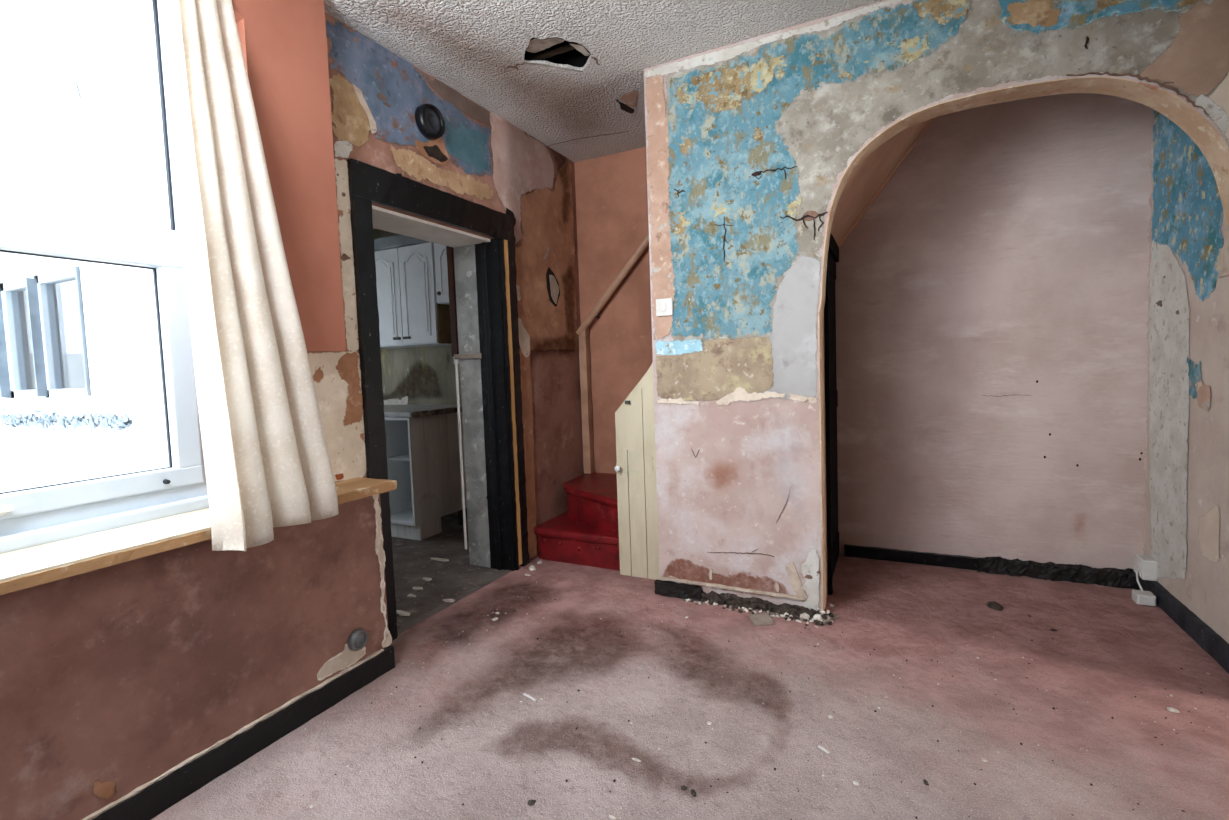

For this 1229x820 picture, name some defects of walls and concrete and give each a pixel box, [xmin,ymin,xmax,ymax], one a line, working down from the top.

peeling [998,0,1198,35]
spalling [524,37,591,67]
peeling [325,18,494,200]
crack [751,166,797,179]
peeling [644,0,971,356]
crack [780,211,828,240]
peeling [308,140,367,482]
peeling [1148,109,1224,580]
spalling [657,387,817,407]
spalling [348,494,392,648]
water stain [667,559,808,603]
spalling [801,548,820,611]